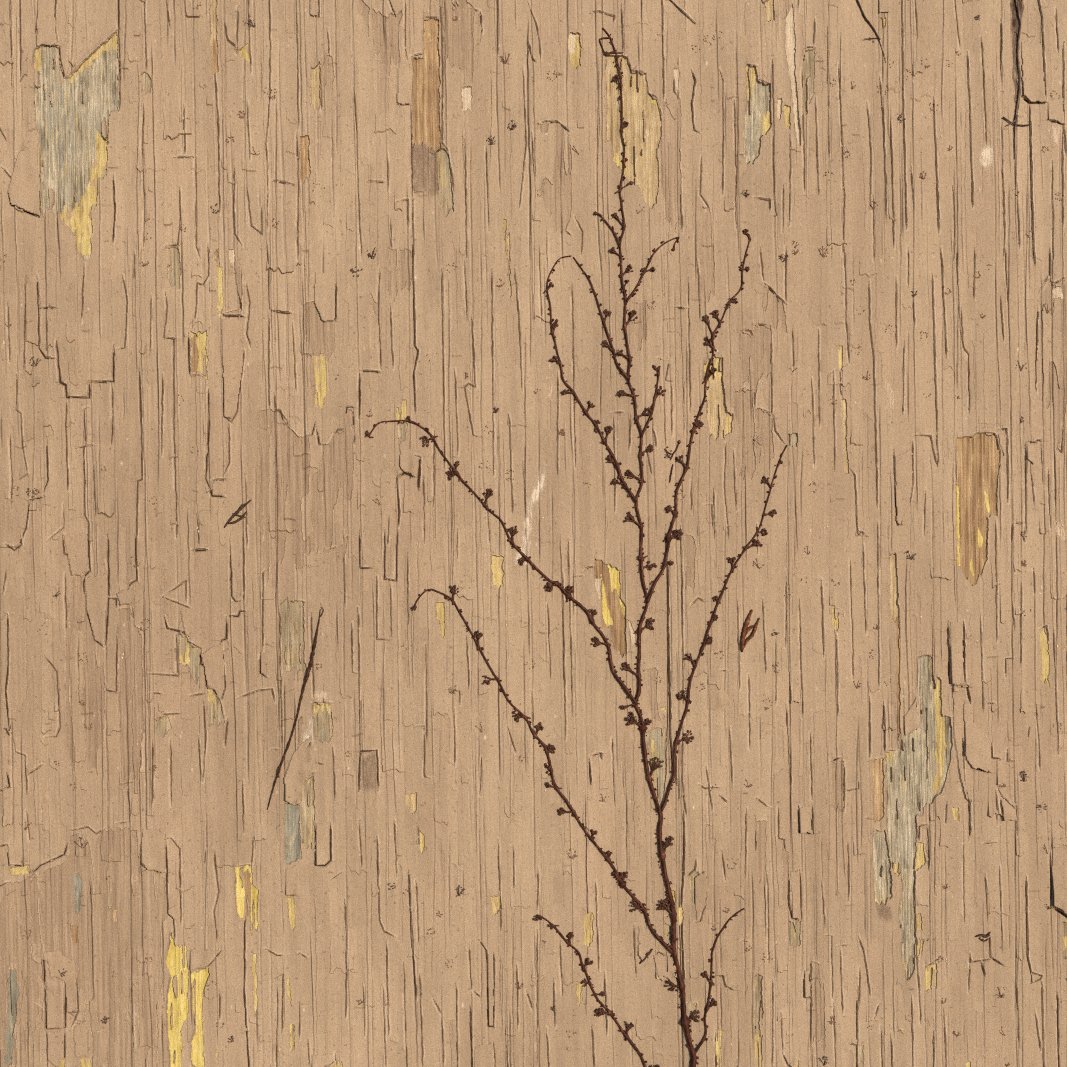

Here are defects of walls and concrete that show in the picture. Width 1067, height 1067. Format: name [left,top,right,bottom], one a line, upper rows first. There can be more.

peeling [8,0,119,260]
crack [519,3,568,207]
peeling [605,56,681,231]
peeling [744,0,815,164]
crack [0,616,172,886]
crack [556,359,576,475]
crack [547,558,592,717]
crack [589,0,1067,1067]
peeling [871,554,992,991]
peeling [956,434,1006,585]
peeling [0,827,219,1067]
crack [140,838,336,1067]